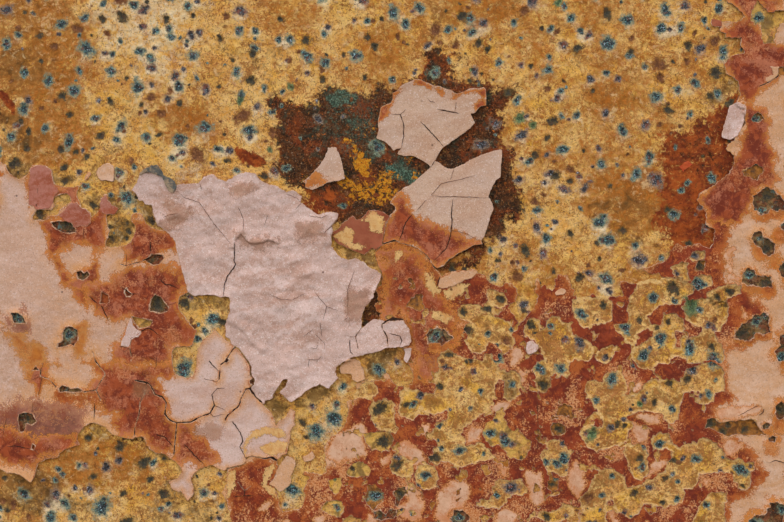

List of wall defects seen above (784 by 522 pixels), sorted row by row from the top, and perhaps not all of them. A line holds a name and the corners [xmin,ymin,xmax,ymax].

spalling [55,13,96,58]
spalling [115,0,128,23]
spalling [131,69,184,103]
crack [394,109,443,148]
spalling [656,2,671,34]
rust [0,184,222,470]
crack [163,185,236,295]
peeling [0,79,630,522]
crack [382,317,403,347]
crack [383,170,479,287]
rust [225,0,784,522]
crack [119,328,277,463]